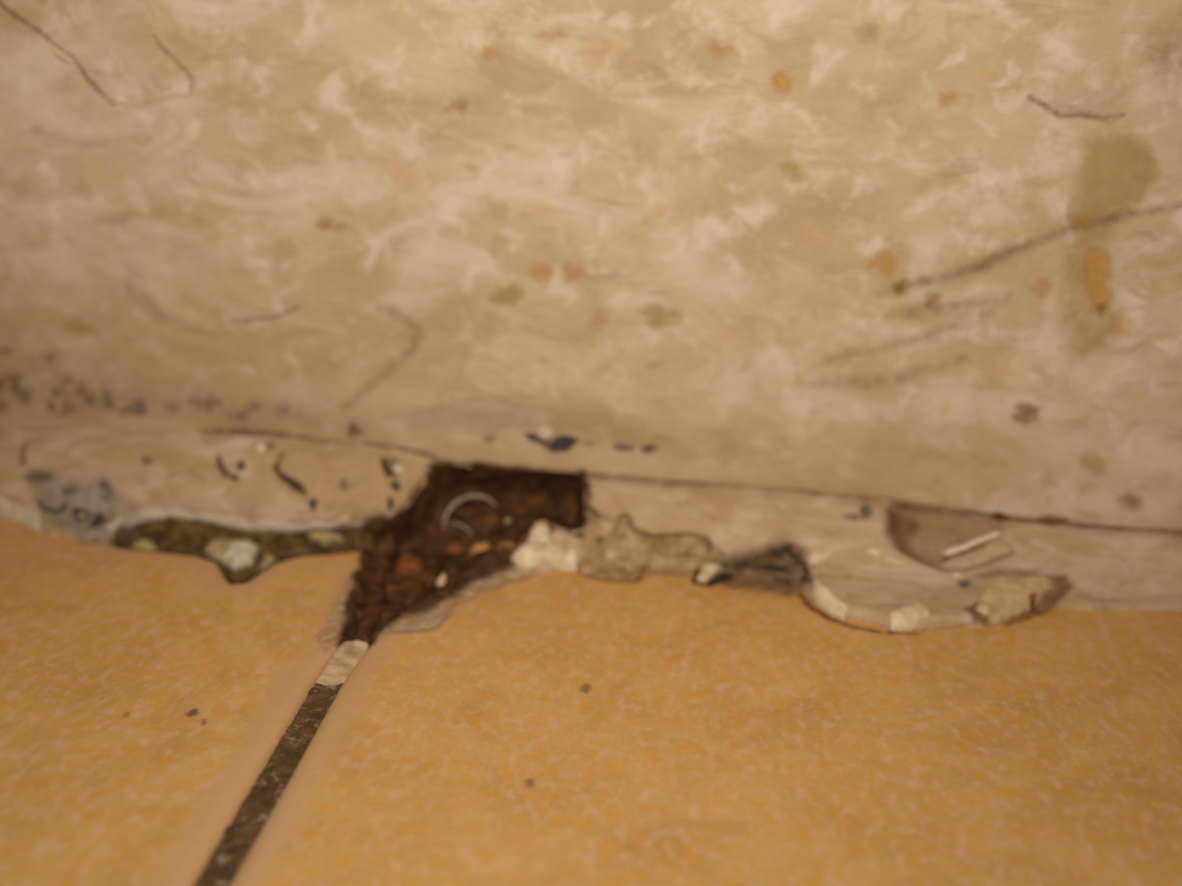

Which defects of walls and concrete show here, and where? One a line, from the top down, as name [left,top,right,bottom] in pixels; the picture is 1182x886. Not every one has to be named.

spalling [254,448,721,648]
spalling [889,507,1015,571]